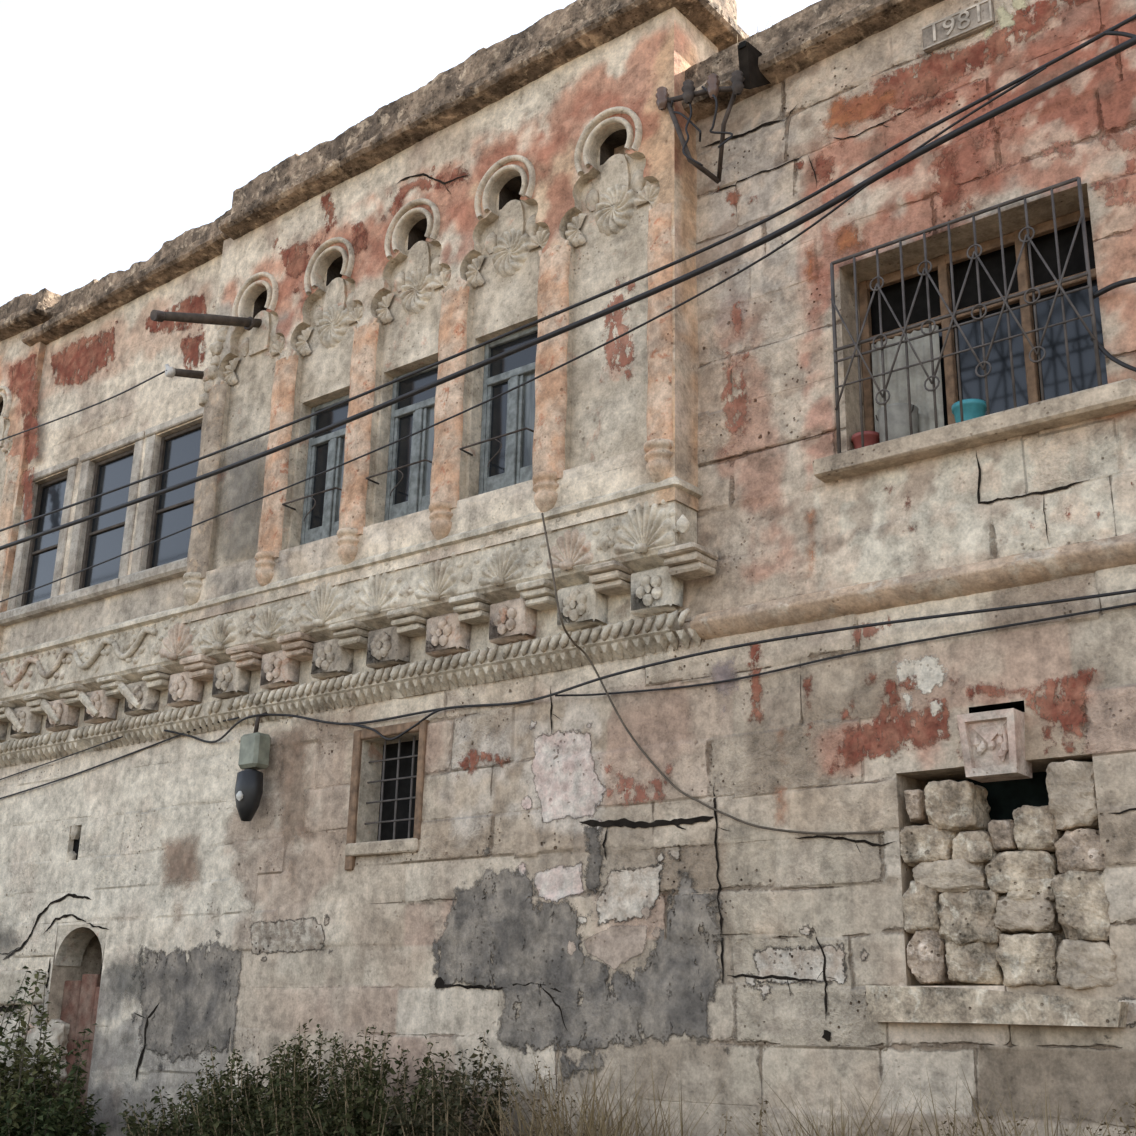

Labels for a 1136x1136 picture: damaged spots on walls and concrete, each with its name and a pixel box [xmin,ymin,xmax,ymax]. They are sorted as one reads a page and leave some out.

peeling [870,0,1091,120]
crack [398,173,468,194]
peeling [1040,140,1075,160]
peeling [51,321,118,386]
peeling [829,674,961,774]
peeling [950,667,1097,753]
crack [0,893,109,960]
crack [0,960,50,1013]
crack [135,1002,160,1081]